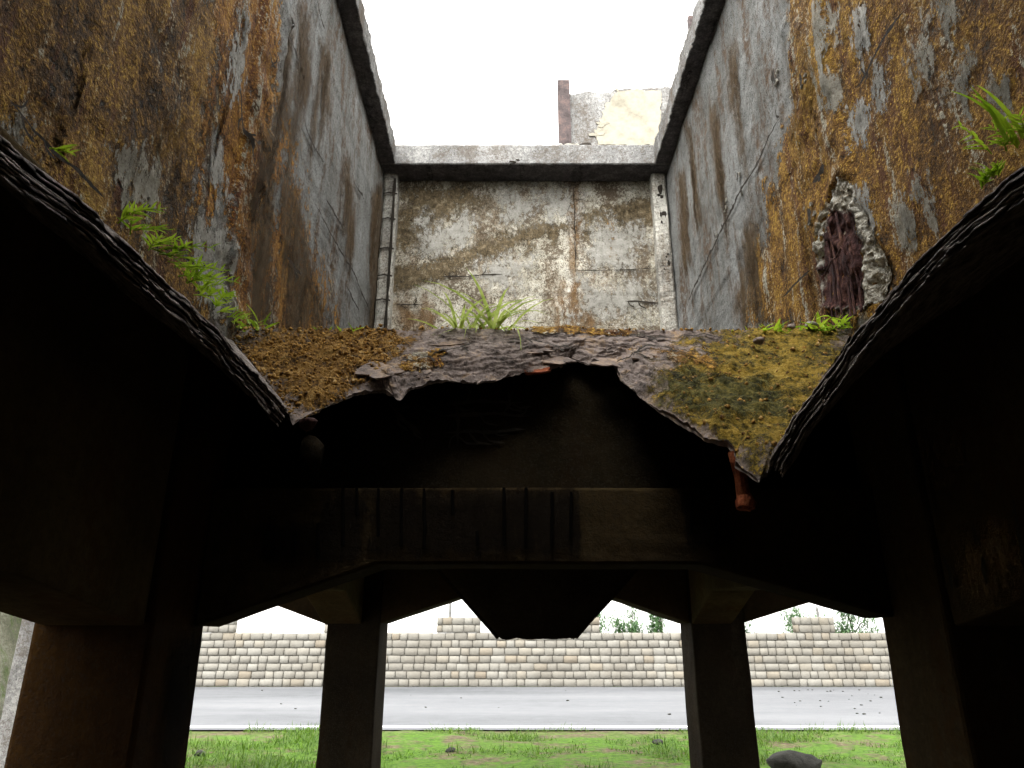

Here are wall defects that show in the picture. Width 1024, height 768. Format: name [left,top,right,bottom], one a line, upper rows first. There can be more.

leakage [248,5,332,330]
leakage [369,185,383,328]
leakage [336,0,724,278]
crack [609,110,784,379]
leakage [709,44,764,331]
spalling [808,176,892,329]
rust [739,0,1024,337]